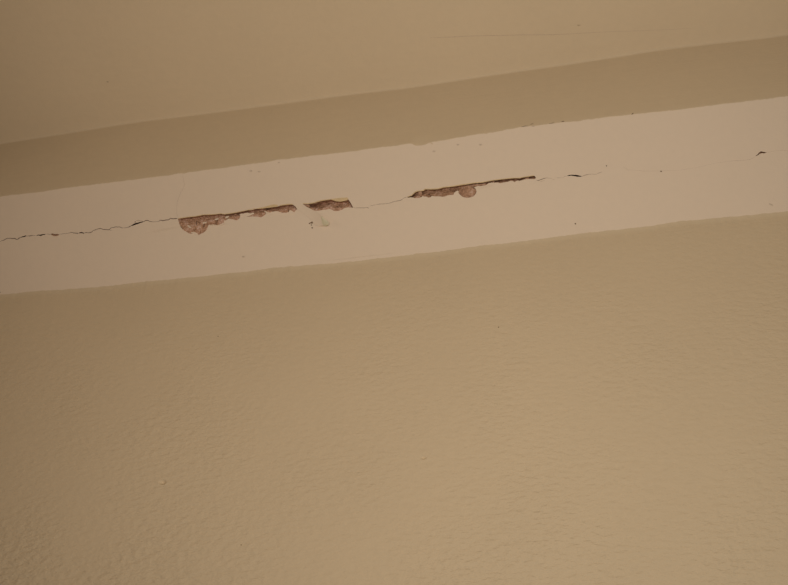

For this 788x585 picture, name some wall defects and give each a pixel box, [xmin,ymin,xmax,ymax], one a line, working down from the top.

spalling [407,175,536,198]
spalling [178,197,353,236]
crack [2,218,178,241]